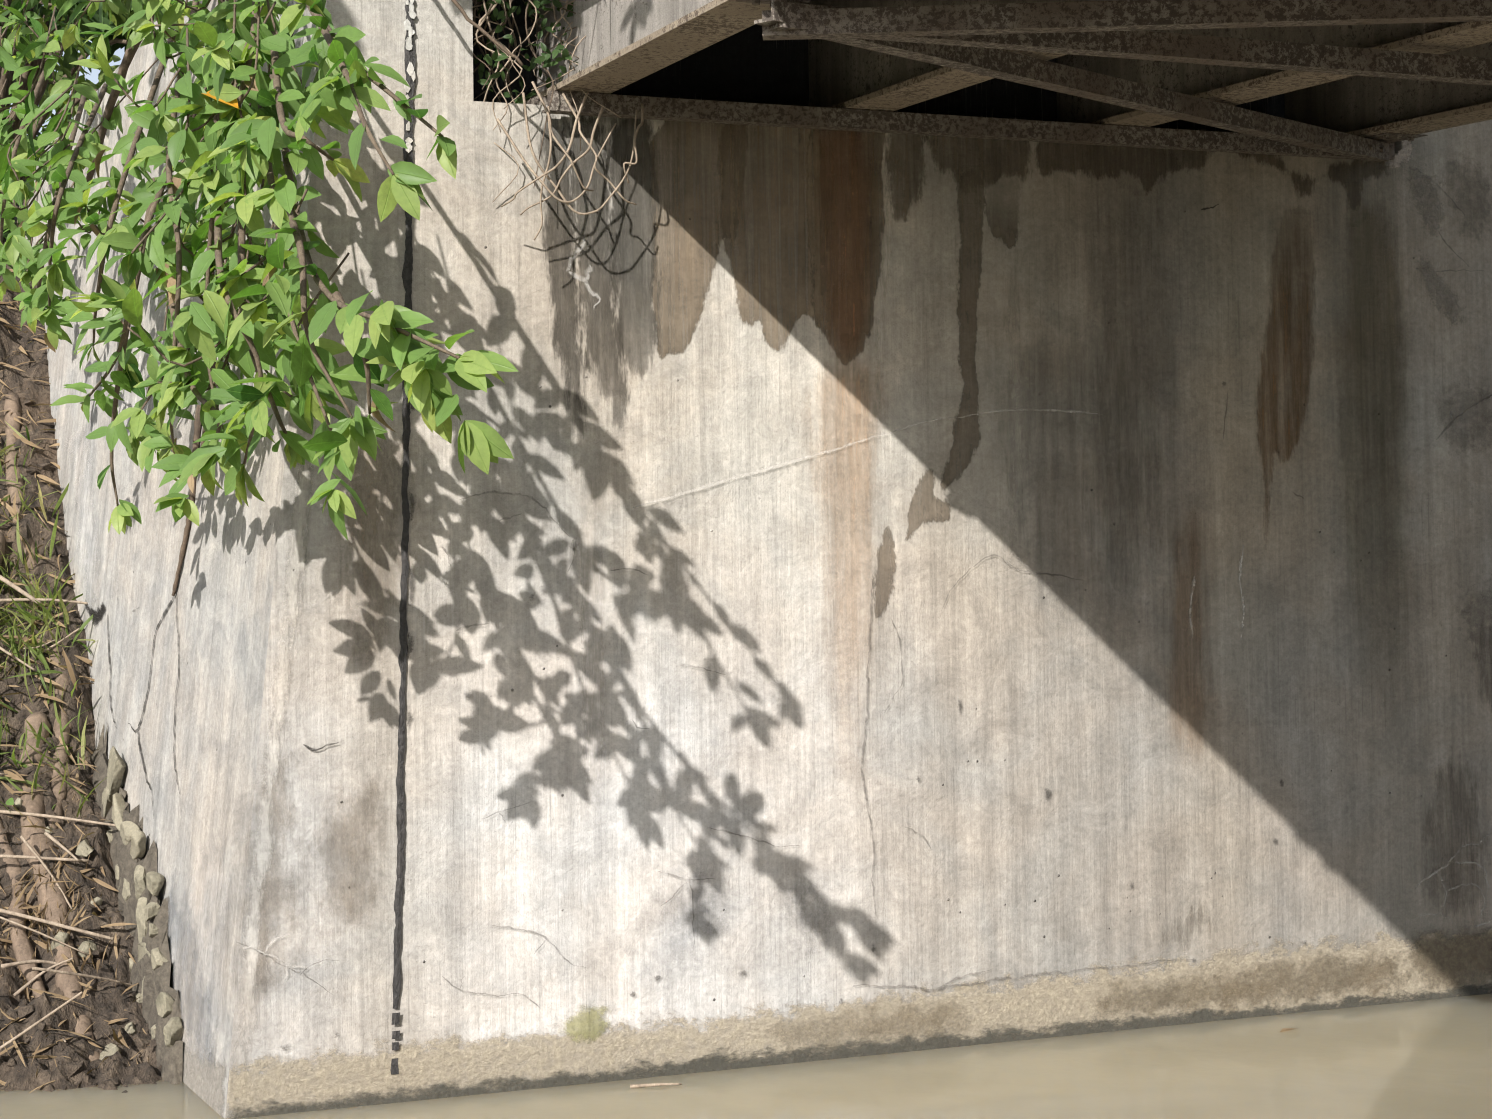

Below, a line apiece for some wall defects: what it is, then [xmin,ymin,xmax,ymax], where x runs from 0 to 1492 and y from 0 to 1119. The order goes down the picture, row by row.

damp [540,116,1211,618]
corrosion [1257,252,1310,504]
damp [76,437,96,601]
crack [107,558,184,816]
damp [169,858,1492,1119]